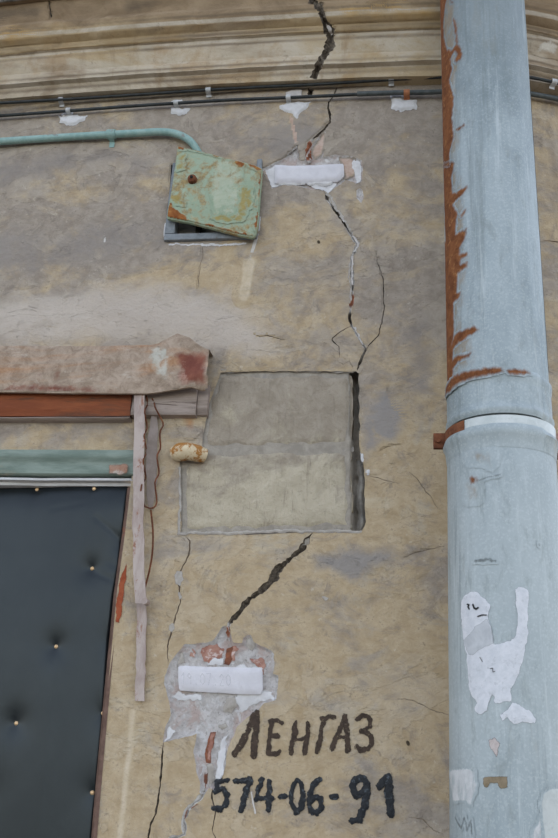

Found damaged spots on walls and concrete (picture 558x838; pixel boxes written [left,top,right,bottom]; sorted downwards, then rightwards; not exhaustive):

crack [289,0,337,164]
spalling [263,132,364,203]
crack [325,193,385,370]
crack [167,537,191,659]
crack [226,534,312,641]
spalling [163,626,278,794]
crack [148,743,216,838]